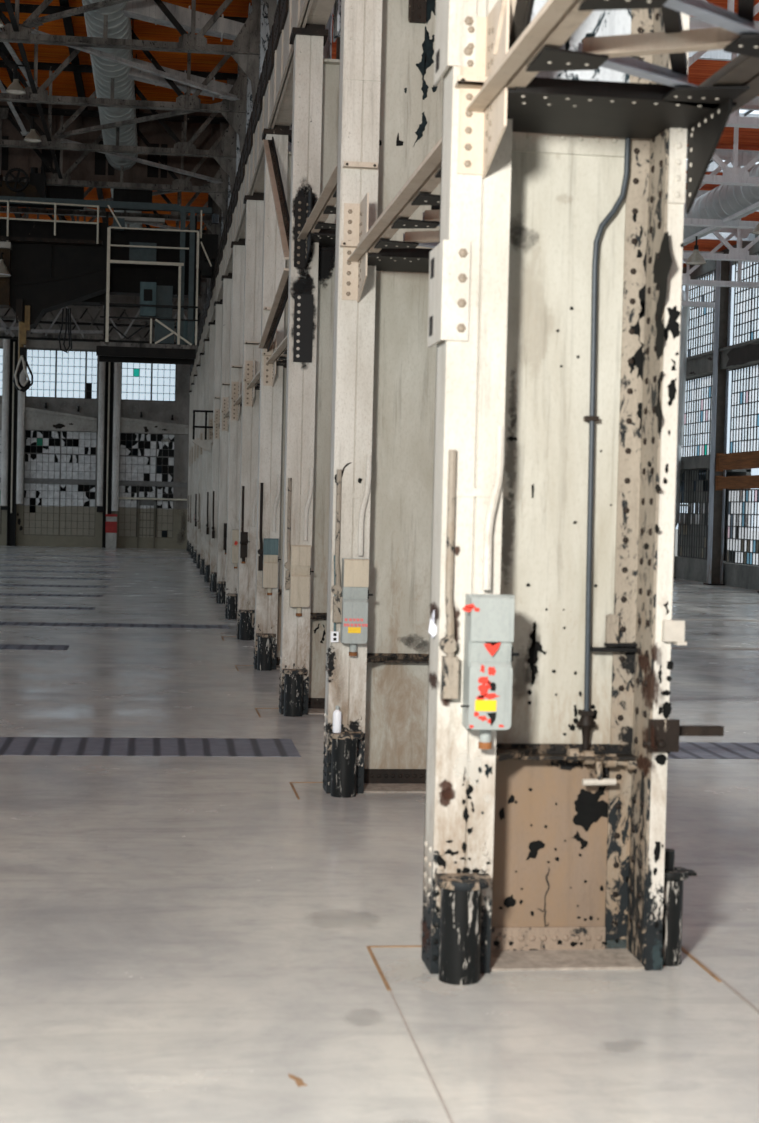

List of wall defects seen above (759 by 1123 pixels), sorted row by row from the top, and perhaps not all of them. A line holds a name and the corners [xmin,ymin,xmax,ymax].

peeling [413,0,437,147]
peeling [628,214,684,435]
peeling [527,621,546,705]
peeling [526,786,608,863]
peeling [499,888,534,916]